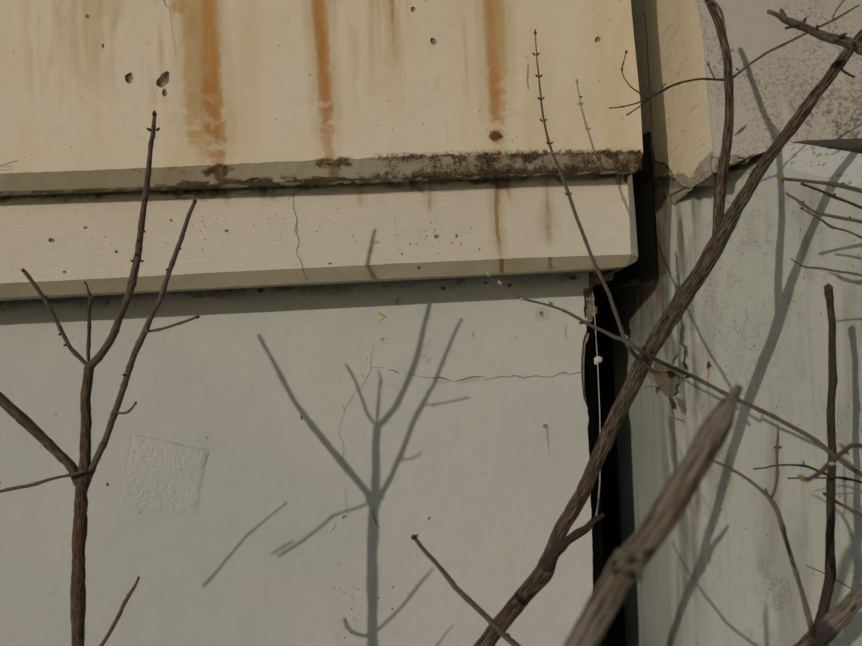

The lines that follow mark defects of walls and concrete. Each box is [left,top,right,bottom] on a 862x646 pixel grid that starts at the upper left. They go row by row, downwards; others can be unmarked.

rust [182,0,226,157]
rust [311,0,333,131]
rust [483,0,506,121]
crack [293,188,307,280]
water stain [149,171,628,197]
crack [339,350,581,516]